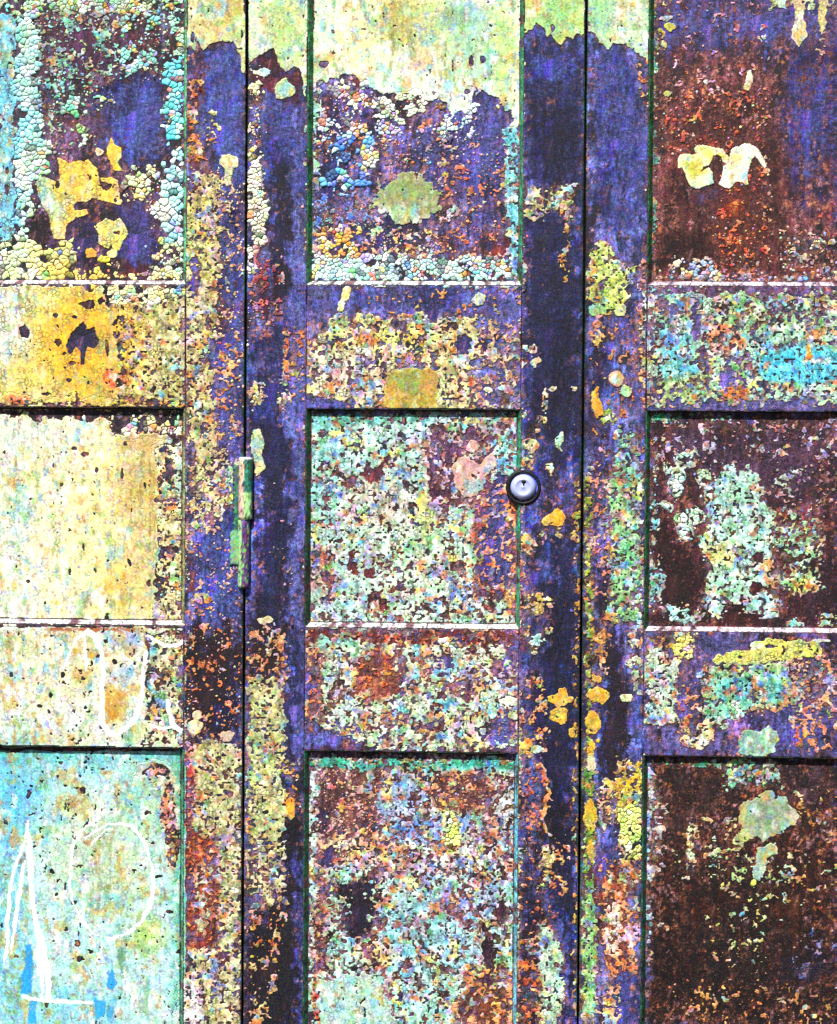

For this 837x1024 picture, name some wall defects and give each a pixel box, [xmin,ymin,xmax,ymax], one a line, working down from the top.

corrosion [656,97,813,281]
peeling [653,0,837,212]
peeling [0,0,649,1024]
corrosion [351,457,395,488]
corrosion [427,478,458,508]
peeling [586,194,837,626]
corrosion [307,539,526,706]
peeling [521,371,837,1024]
corrosion [185,772,227,965]
corrosion [592,753,837,1024]